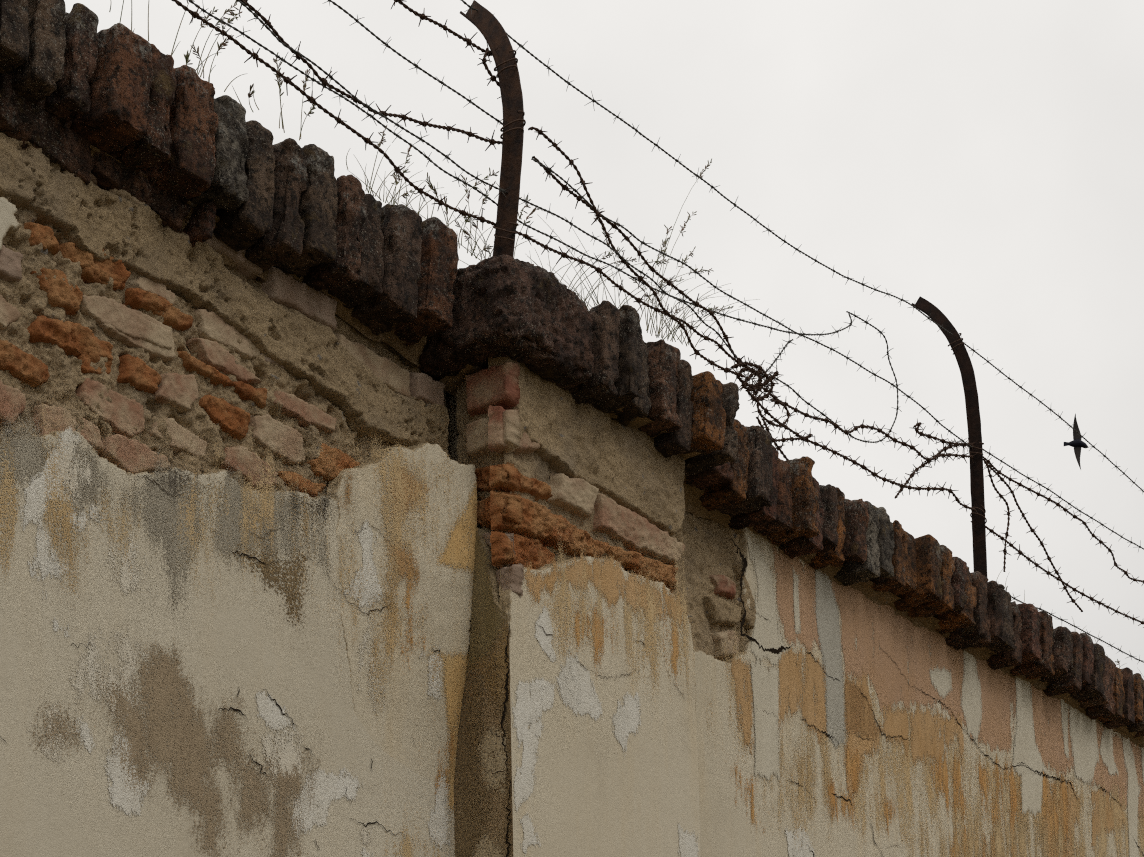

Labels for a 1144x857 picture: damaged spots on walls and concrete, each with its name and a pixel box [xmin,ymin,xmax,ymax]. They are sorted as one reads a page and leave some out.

water stain [0,391,341,637]
spalling [0,196,402,612]
spalling [466,361,685,596]
spalling [16,617,363,857]
crack [486,613,553,857]
peeling [471,607,642,857]
crack [577,638,686,701]
water stain [747,537,847,783]
peeling [769,544,1144,827]
water stain [929,650,985,741]
water stain [1012,676,1046,817]
water stain [1061,699,1144,857]